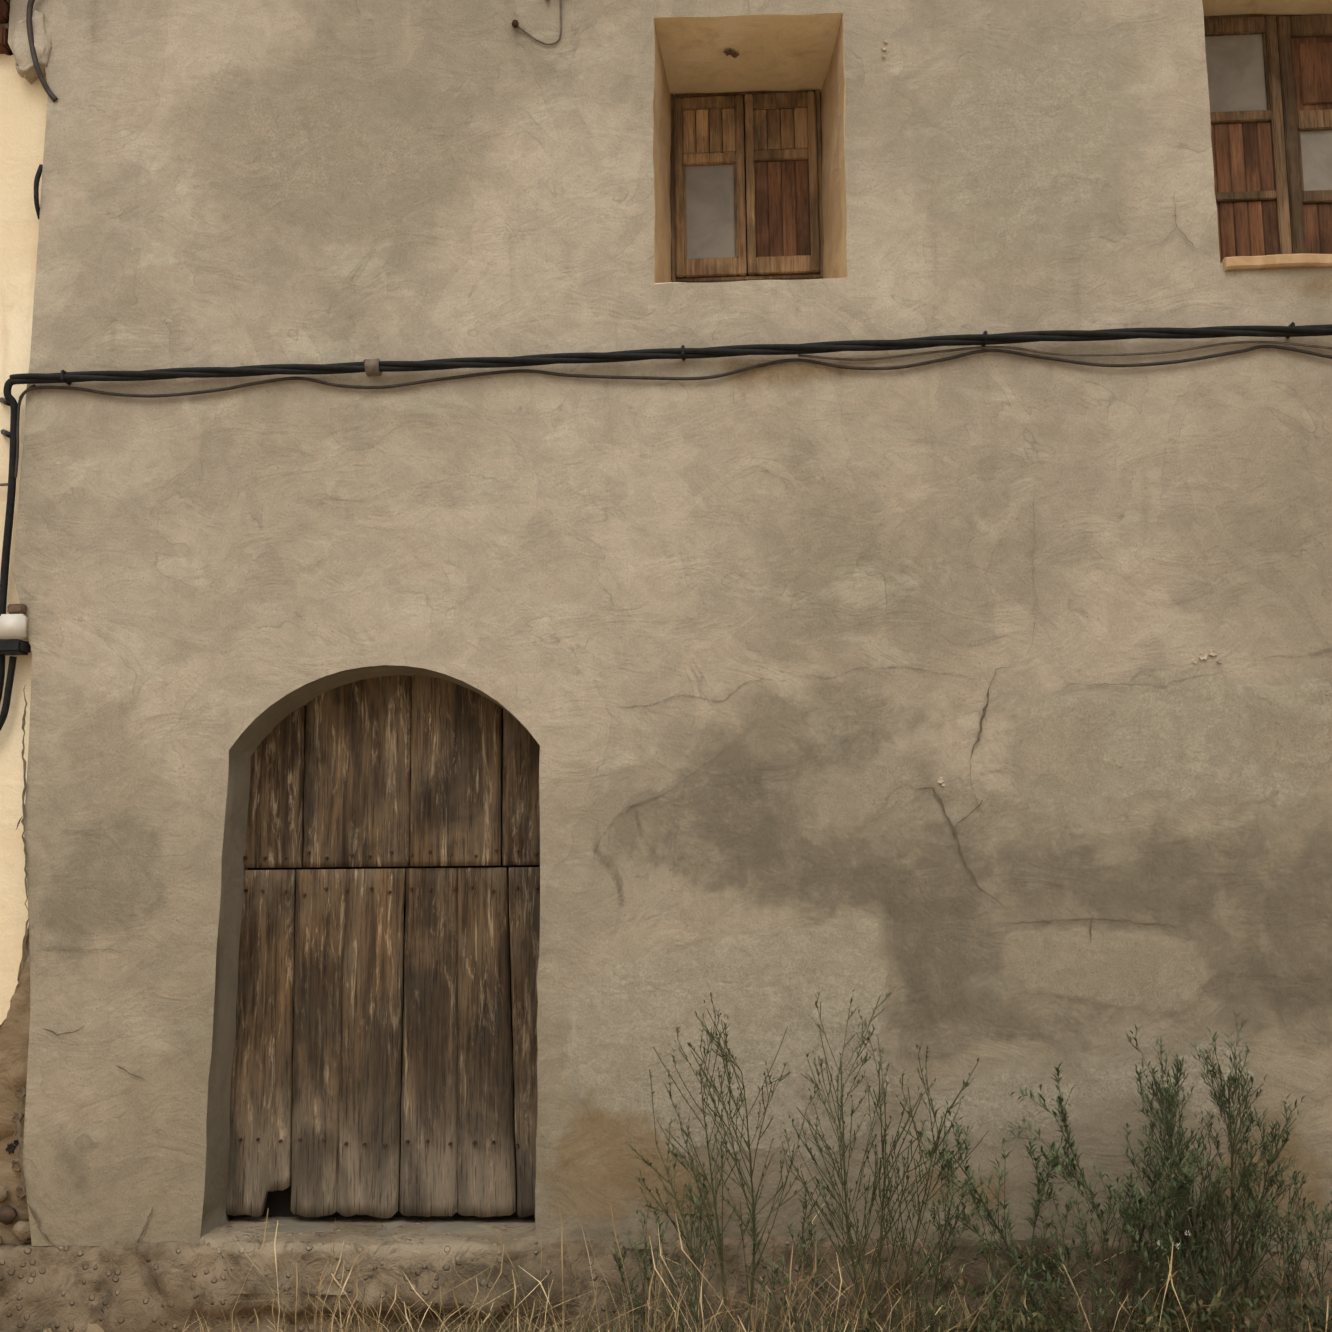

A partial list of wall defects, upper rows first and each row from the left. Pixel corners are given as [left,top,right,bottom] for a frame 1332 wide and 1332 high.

crack [863,491,1241,941]
water stain [1006,665,1332,831]
spalling [0,954,31,1246]
spalling [86,1323,105,1332]